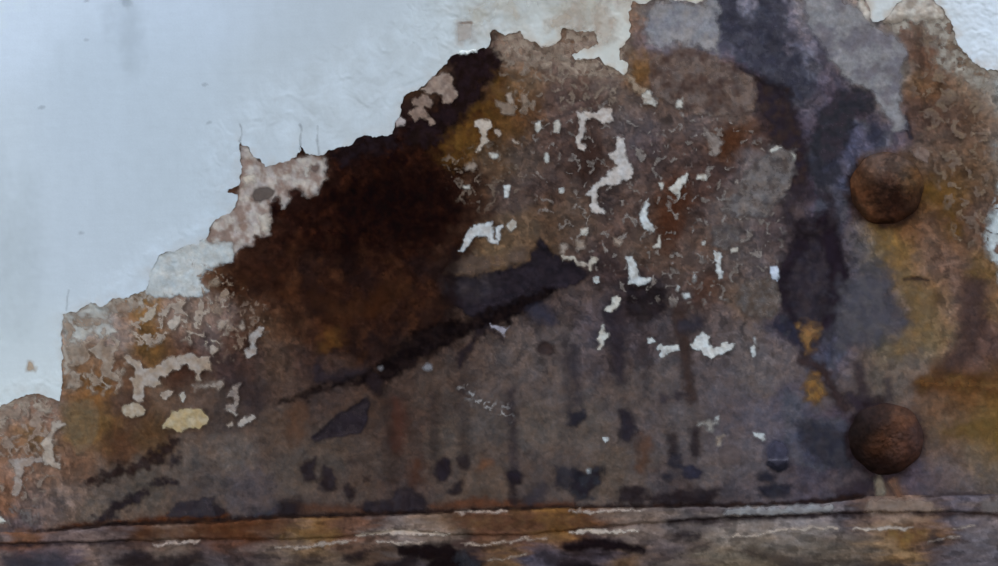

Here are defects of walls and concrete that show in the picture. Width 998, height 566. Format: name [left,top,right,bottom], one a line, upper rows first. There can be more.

peeling [408,94,435,126]
peeling [421,56,458,103]
corrosion [227,48,506,353]
peeling [460,222,503,252]
peeling [586,137,633,214]
damp [715,0,882,411]
spalling [450,238,588,318]
damp [606,304,623,380]
damp [661,304,704,402]
peeling [690,332,734,359]
peeling [162,409,209,432]
damp [0,389,875,566]